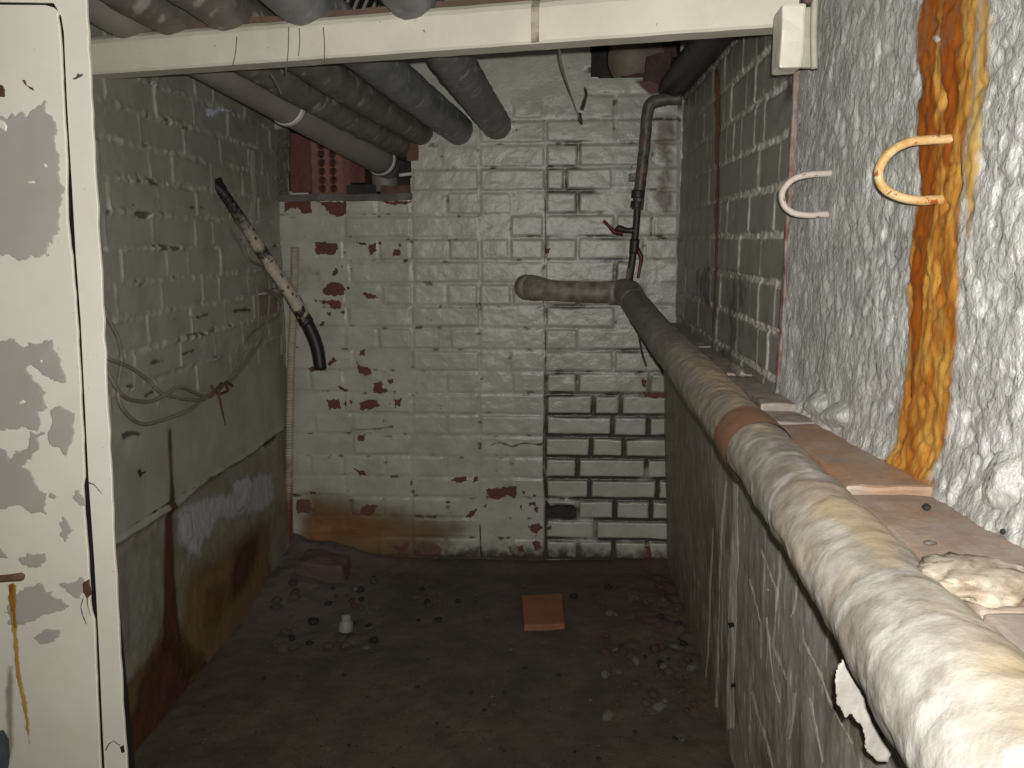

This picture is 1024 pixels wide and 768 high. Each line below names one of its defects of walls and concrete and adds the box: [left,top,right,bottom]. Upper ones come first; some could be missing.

peeling [0,100,65,261]
peeling [284,201,347,217]
peeling [315,241,338,255]
rust [886,0,989,487]
peeling [314,265,350,326]
peeling [327,349,402,411]
peeling [0,338,75,514]
efflorescence [177,472,274,556]
peeling [0,548,46,568]
peeling [5,577,84,644]
rust [127,432,272,752]
rust [8,584,29,735]